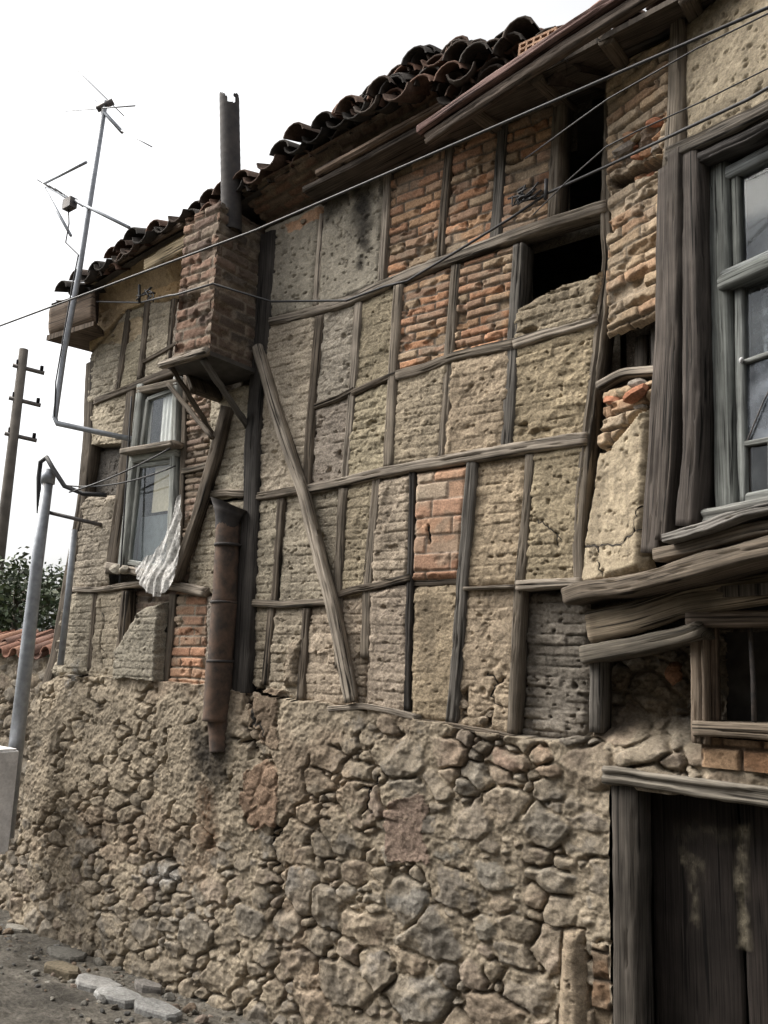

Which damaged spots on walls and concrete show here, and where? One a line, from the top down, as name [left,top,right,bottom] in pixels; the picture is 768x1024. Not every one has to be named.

spalling [612,115,665,165]
spalling [597,378,652,452]
crack [538,505,644,576]